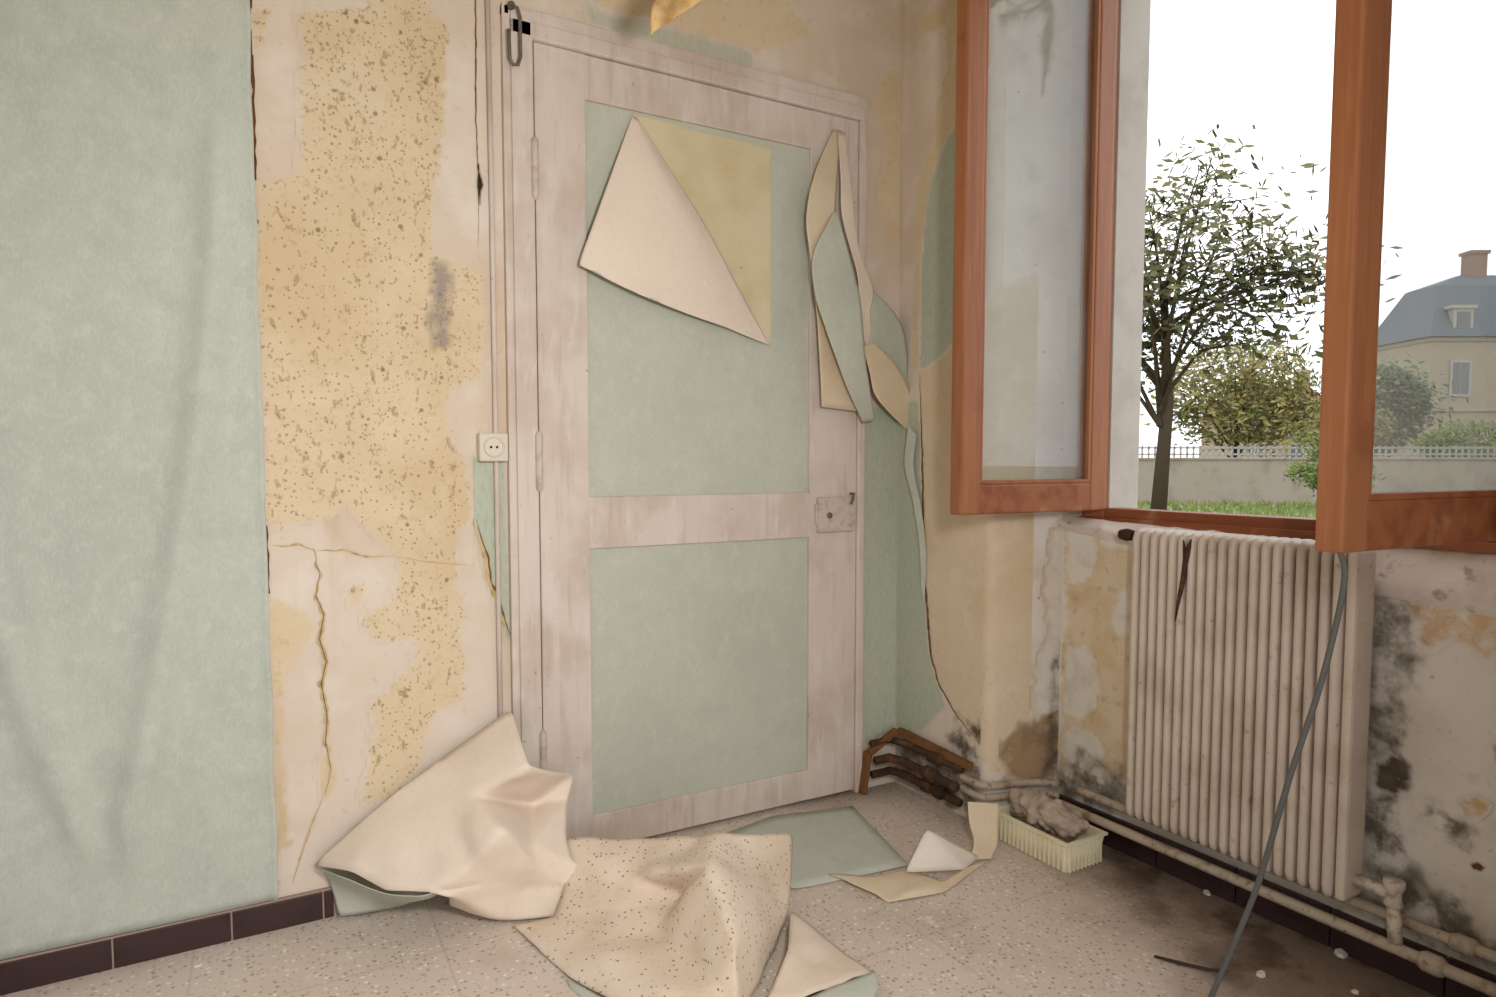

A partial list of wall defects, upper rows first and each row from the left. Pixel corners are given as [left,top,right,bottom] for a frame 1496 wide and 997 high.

peeling [597,0,818,58]
peeling [631,113,772,349]
peeling [251,0,492,810]
peeling [269,593,320,855]
crack [273,543,472,881]
leakage [1000,540,1133,801]
leakage [1364,706,1409,848]
leakage [1377,870,1479,942]
leakage [1448,818,1466,835]